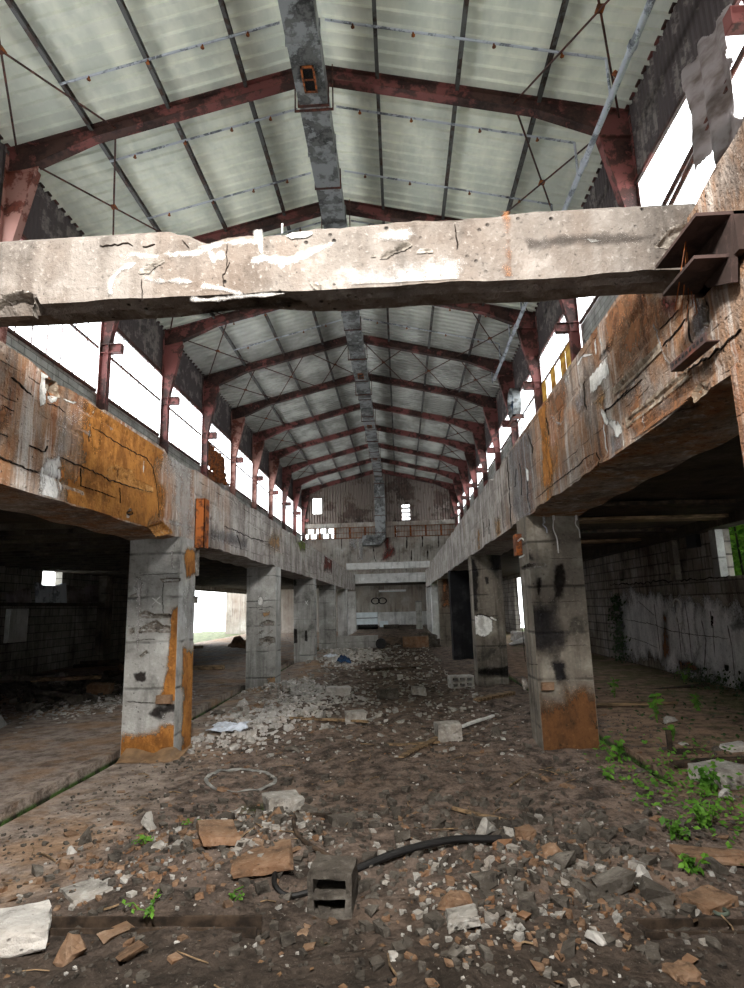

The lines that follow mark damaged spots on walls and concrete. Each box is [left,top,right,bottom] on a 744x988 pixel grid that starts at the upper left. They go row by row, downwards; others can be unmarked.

leakage [175,230,321,267]
spalling [0,290,39,324]
crack [660,299,741,370]
crack [2,377,66,413]
crack [0,427,159,518]
rust [59,400,165,527]
rust [538,389,566,502]
crack [583,379,642,412]
rust [629,385,686,438]
peeling [619,589,744,689]
rust [120,606,193,756]
rust [541,687,600,750]